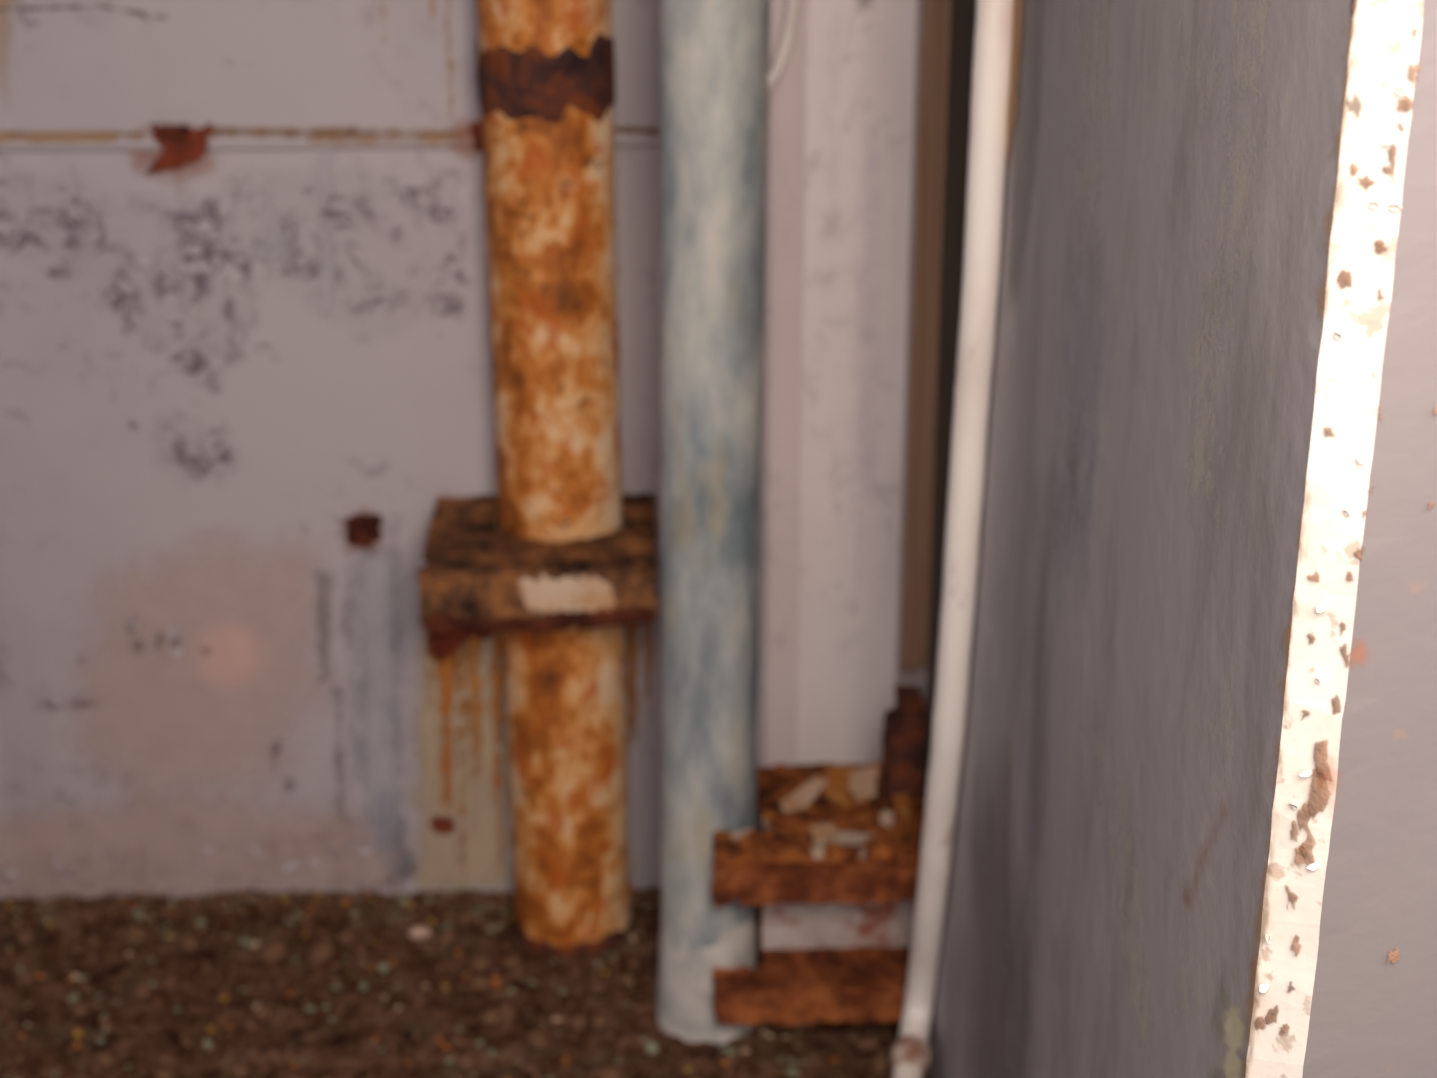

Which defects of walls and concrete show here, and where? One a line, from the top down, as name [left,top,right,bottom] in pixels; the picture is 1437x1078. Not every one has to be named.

corrosion [0,132,143,143]
corrosion [202,127,402,144]
corrosion [417,607,654,889]
corrosion [823,764,855,808]
corrosion [1248,845,1271,1043]